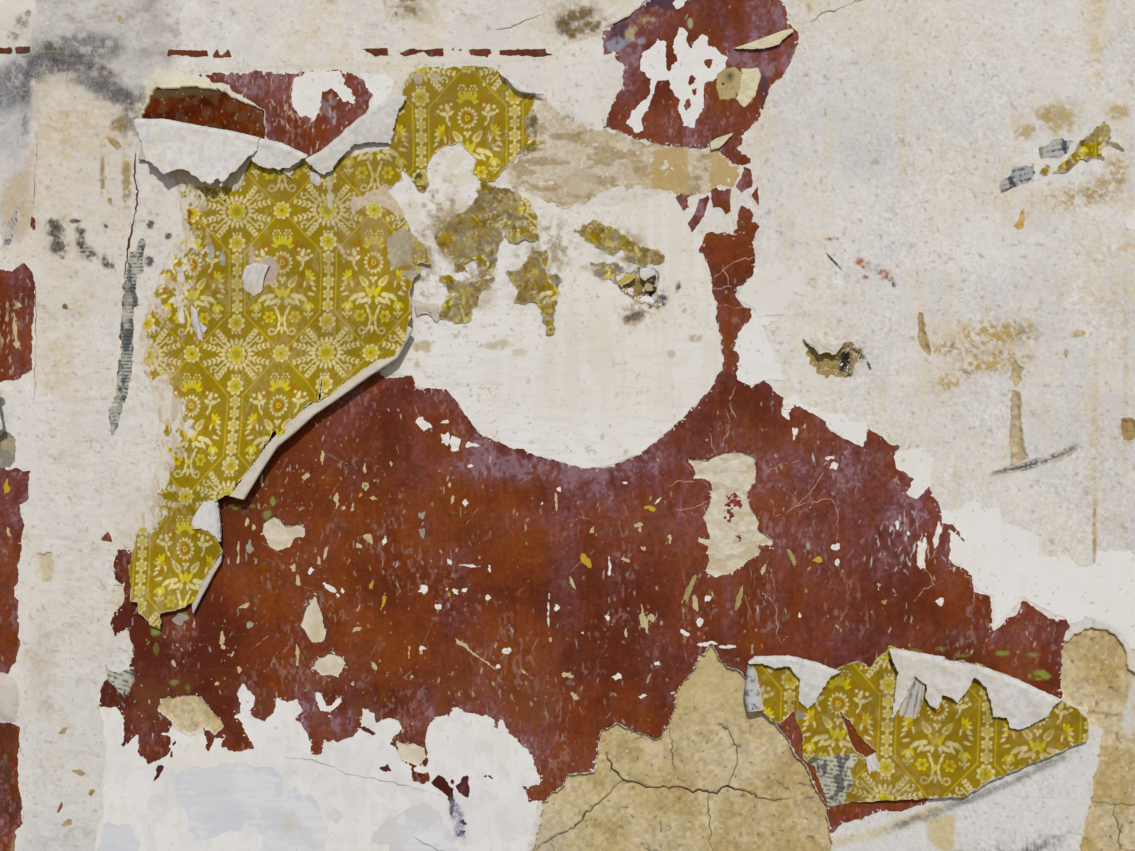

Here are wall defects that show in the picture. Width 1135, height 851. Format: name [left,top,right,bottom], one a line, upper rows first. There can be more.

peeling [142,70,394,156]
peeling [602,0,799,232]
peeling [97,206,1135,851]
crack [542,724,813,850]